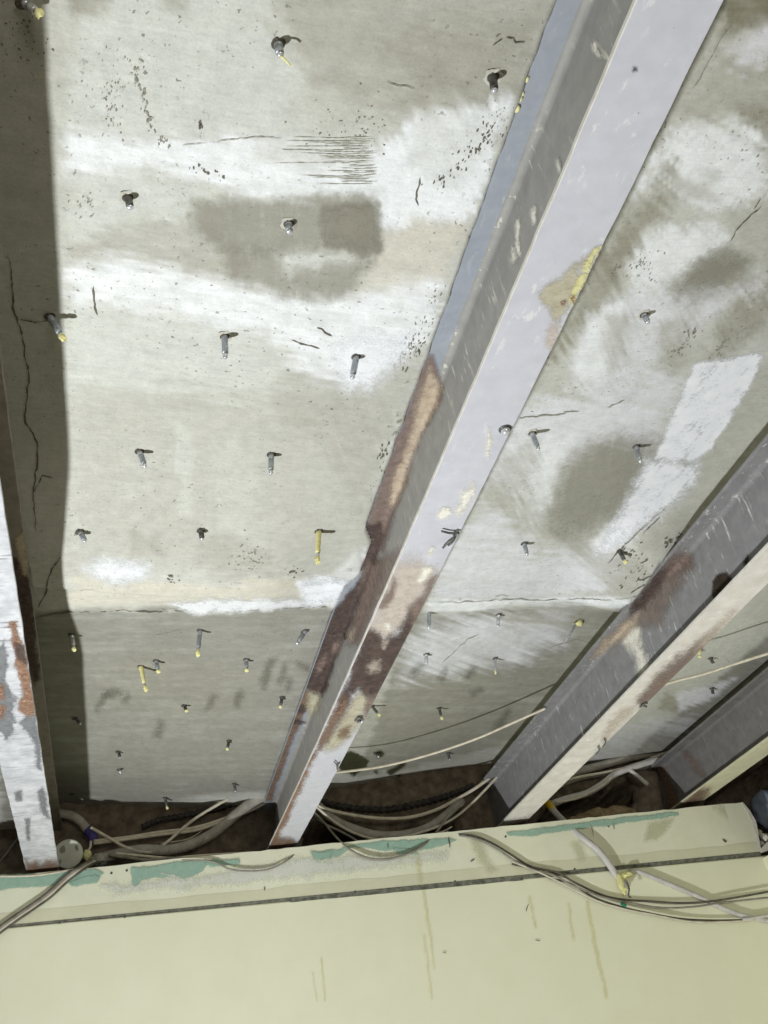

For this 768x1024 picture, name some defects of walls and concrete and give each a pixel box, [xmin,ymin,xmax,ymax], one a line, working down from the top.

corrosion [266,356,442,850]